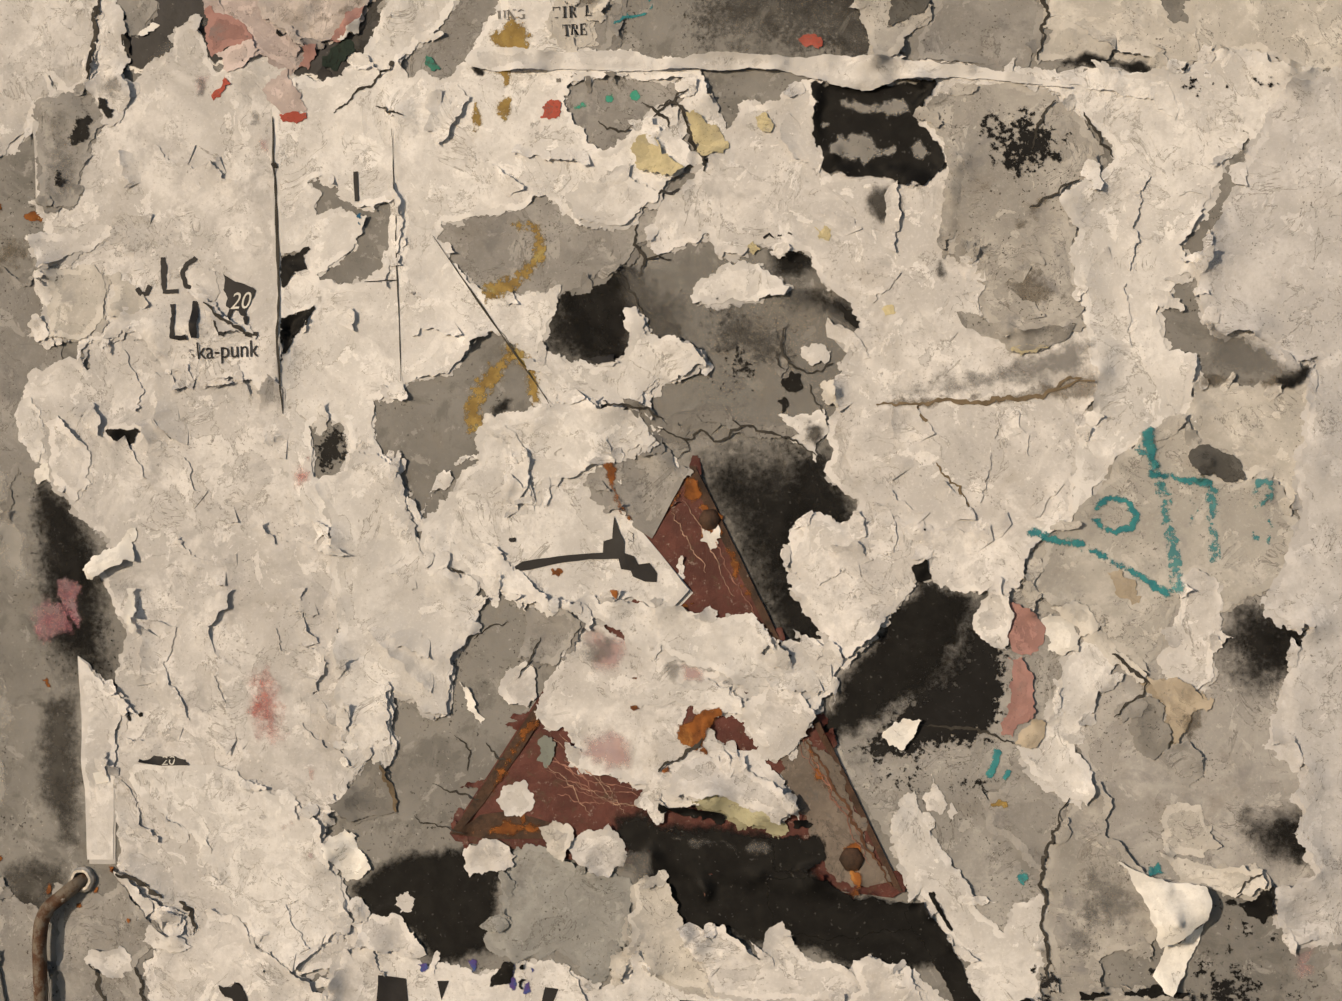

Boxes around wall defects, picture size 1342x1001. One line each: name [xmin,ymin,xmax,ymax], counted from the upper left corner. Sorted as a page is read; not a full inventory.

crack [1037,0,1050,60]
crack [334,61,402,381]
crack [432,235,551,407]
corrosion [603,462,630,520]
peeling [460,778,487,790]
corrosion [493,720,539,792]
peeling [505,712,530,730]
corrosion [677,707,722,755]
corrosion [489,812,540,837]
corrosion [849,871,861,898]
crack [1037,798,1070,999]
crack [1237,873,1263,895]